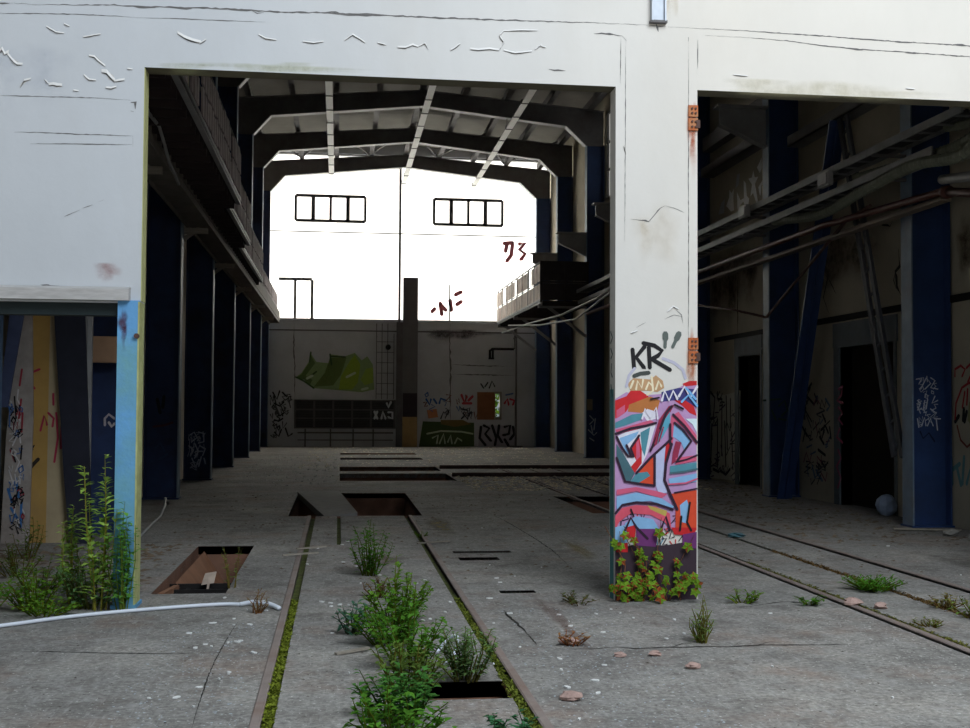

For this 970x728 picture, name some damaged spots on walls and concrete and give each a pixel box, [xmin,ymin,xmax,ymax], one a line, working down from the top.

peeling [177,31,206,45]
peeling [450,29,546,54]
peeling [84,54,133,90]
crack [0,2,970,351]
crack [192,626,235,726]